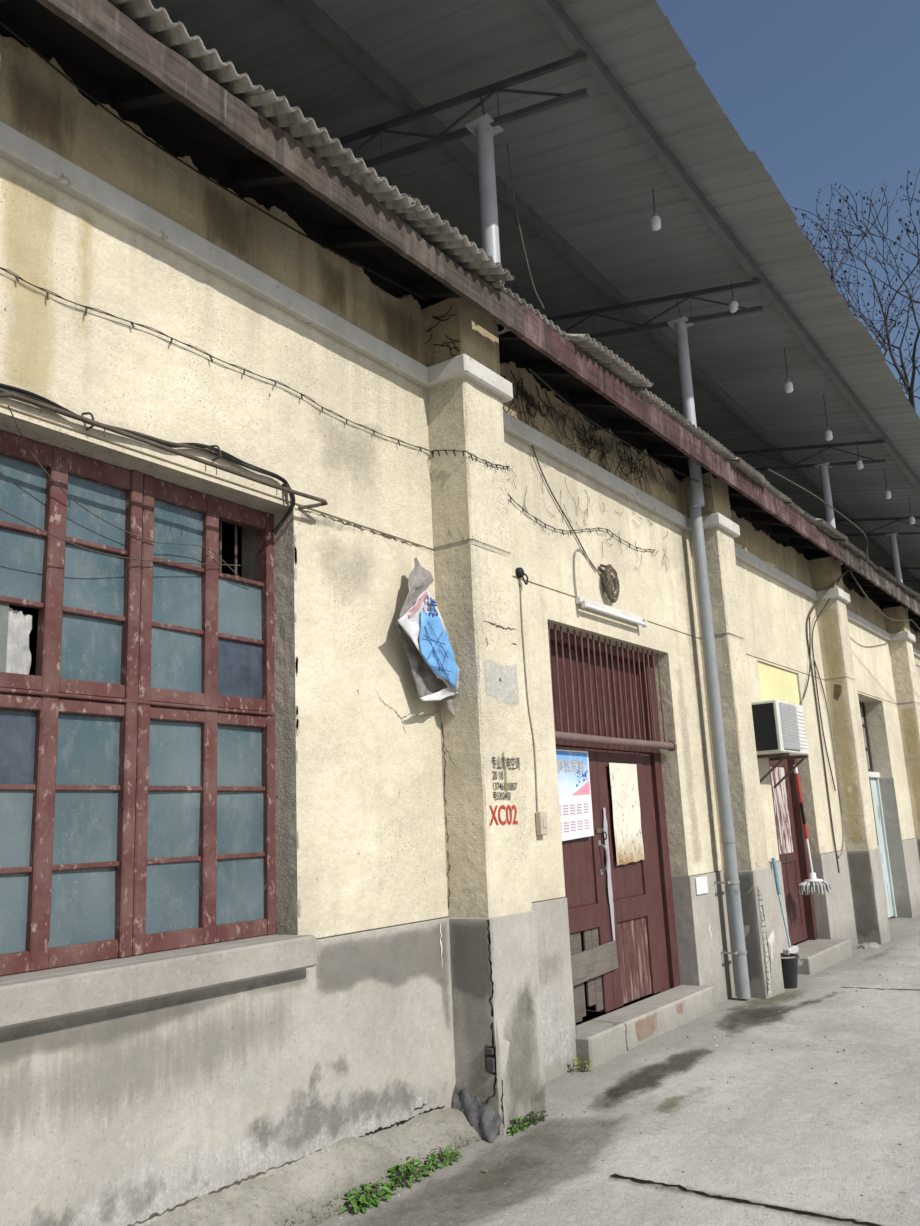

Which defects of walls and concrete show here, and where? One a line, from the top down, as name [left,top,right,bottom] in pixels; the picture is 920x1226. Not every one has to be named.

damp [74,1092,421,1226]
crack [610,1174,882,1226]